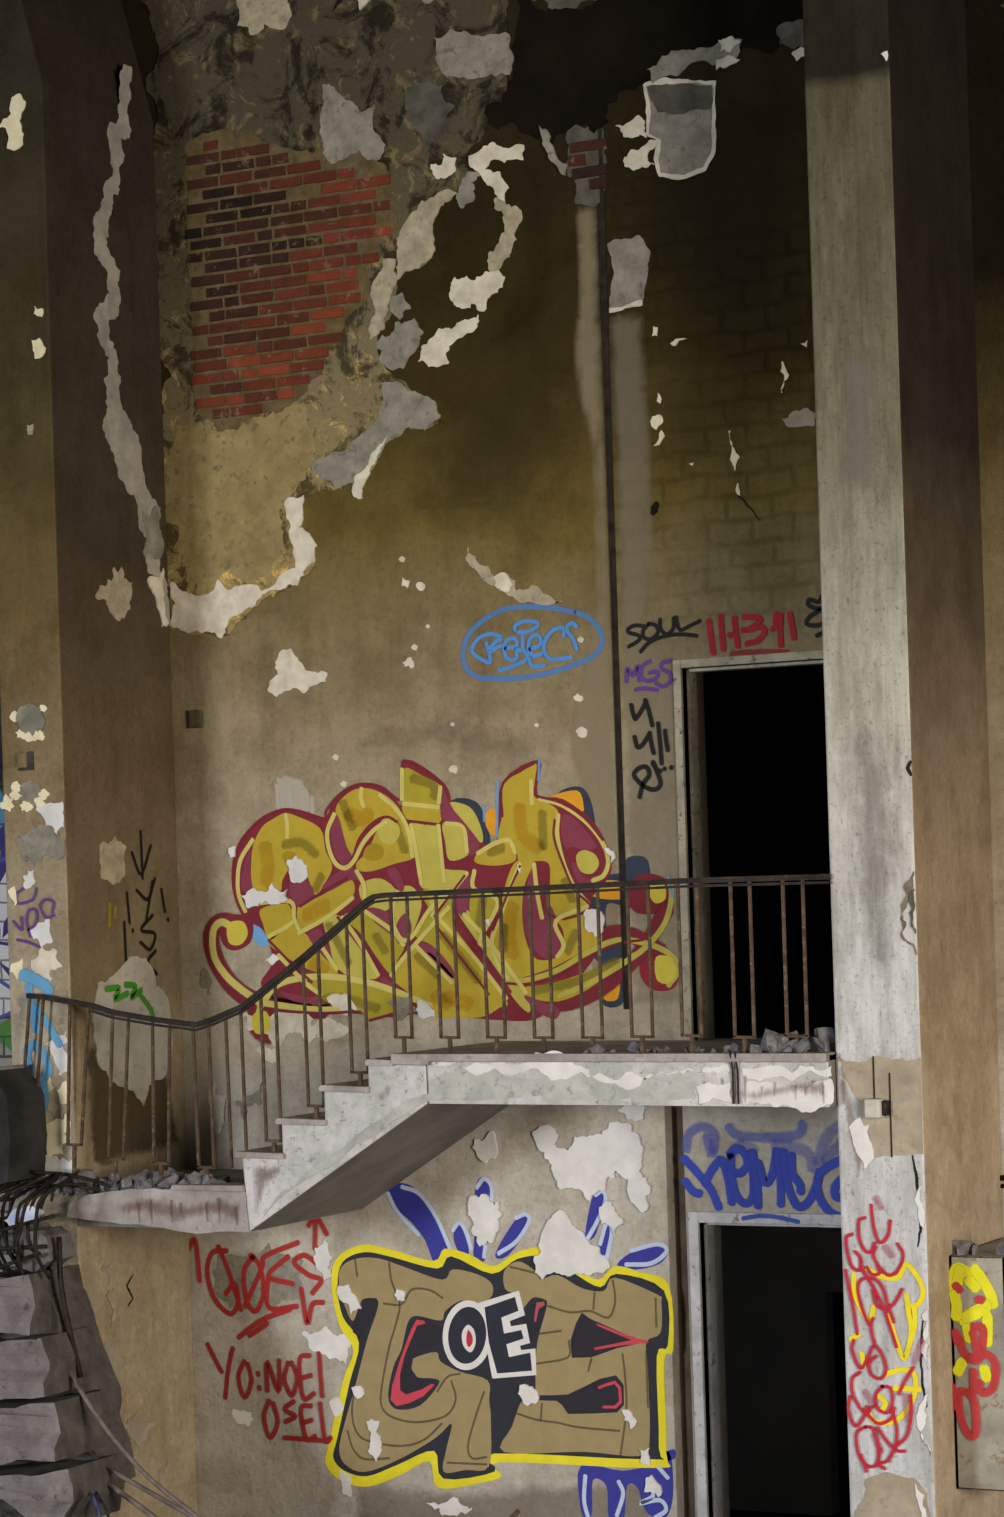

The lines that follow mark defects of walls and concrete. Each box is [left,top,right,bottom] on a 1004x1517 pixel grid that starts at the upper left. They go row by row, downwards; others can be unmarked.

peeling [776,19,804,61]
flaking render [93,0,742,638]
flaking render [781,408,816,427]
peeling [267,649,328,697]
peeling [436,1051,923,1234]
peeling [468,1194,503,1246]
peeling [533,1209,611,1280]
peeling [394,1289,406,1301]
peeling [366,1419,382,1462]
peeling [518,1384,539,1406]
peeling [622,1409,637,1429]
peeling [638,1448,663,1497]